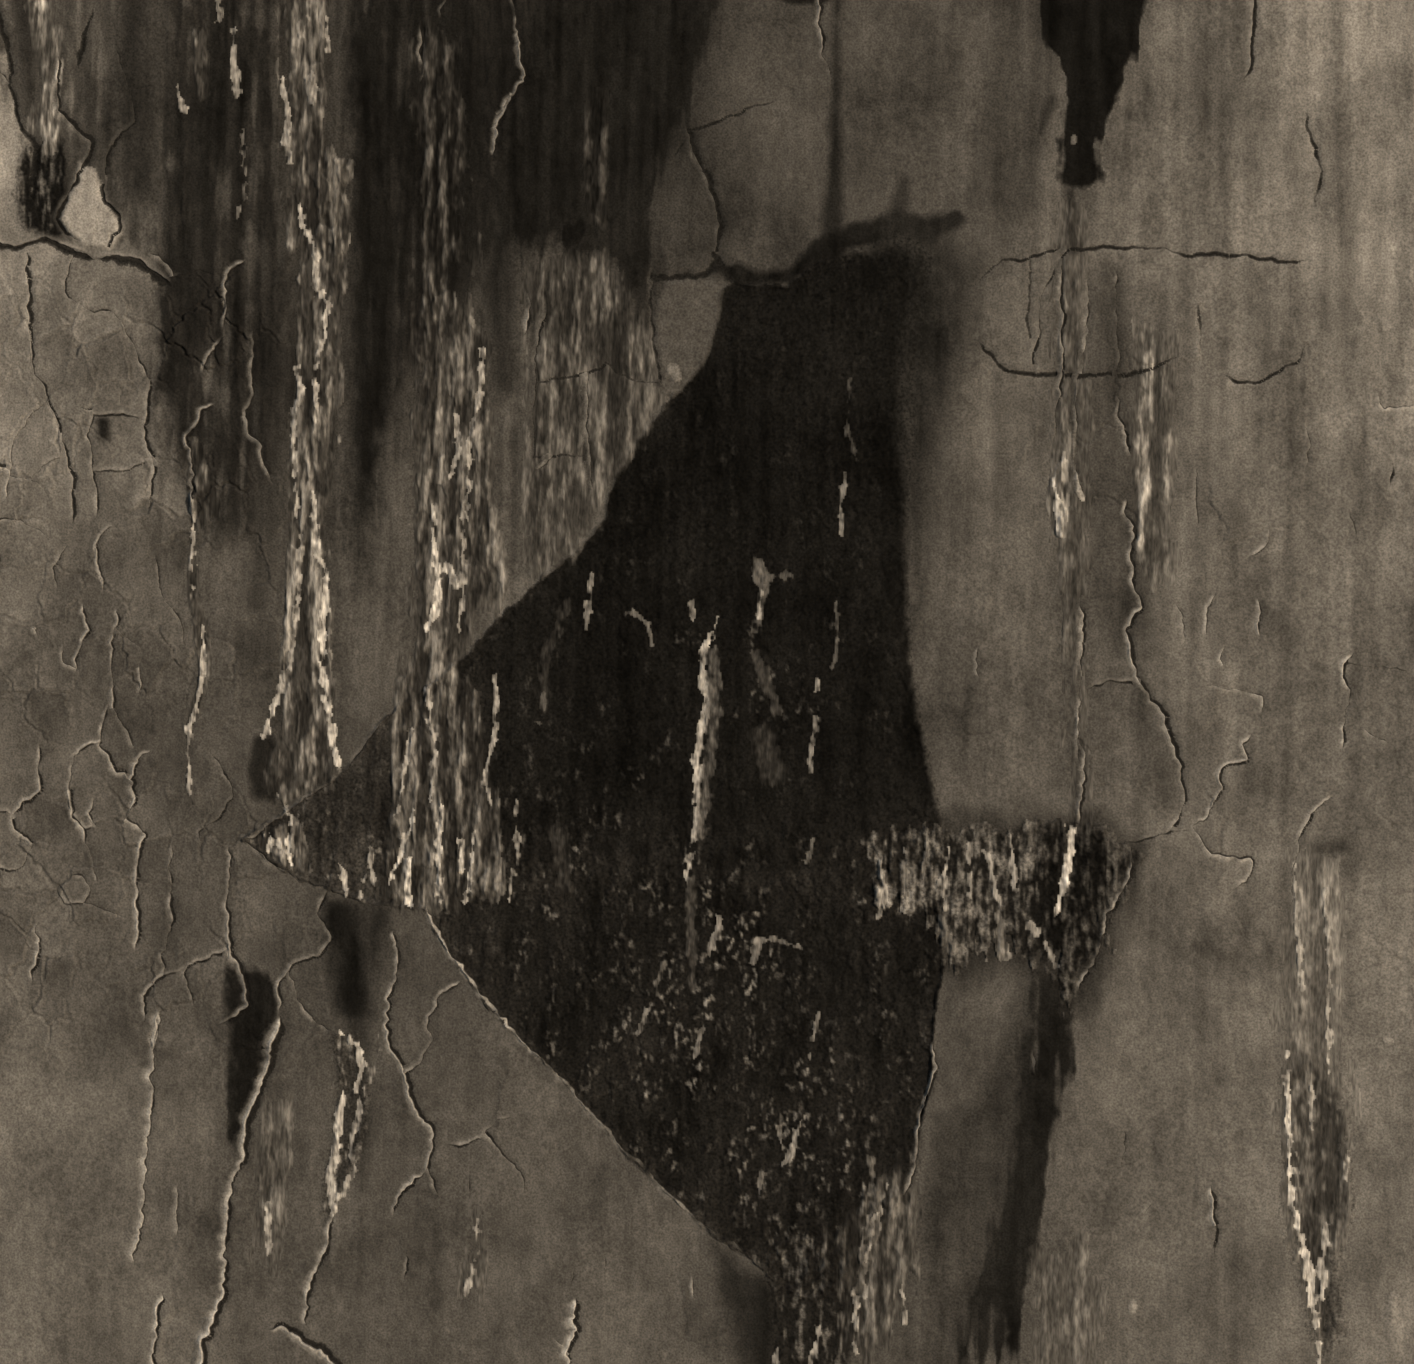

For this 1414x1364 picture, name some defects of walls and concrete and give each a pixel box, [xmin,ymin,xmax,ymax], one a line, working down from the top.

crack [0,7,388,1364]
spalling [241,713,393,906]
leakage [0,0,726,1198]
spalling [432,233,1145,1364]
leakage [708,0,1023,686]
leakage [819,0,1196,1364]
crack [972,244,1310,499]
crack [1071,498,1336,994]
leakage [221,960,295,1290]
spalling [318,1029,382,1228]
crack [379,909,746,1257]
spalling [1277,1086,1358,1357]